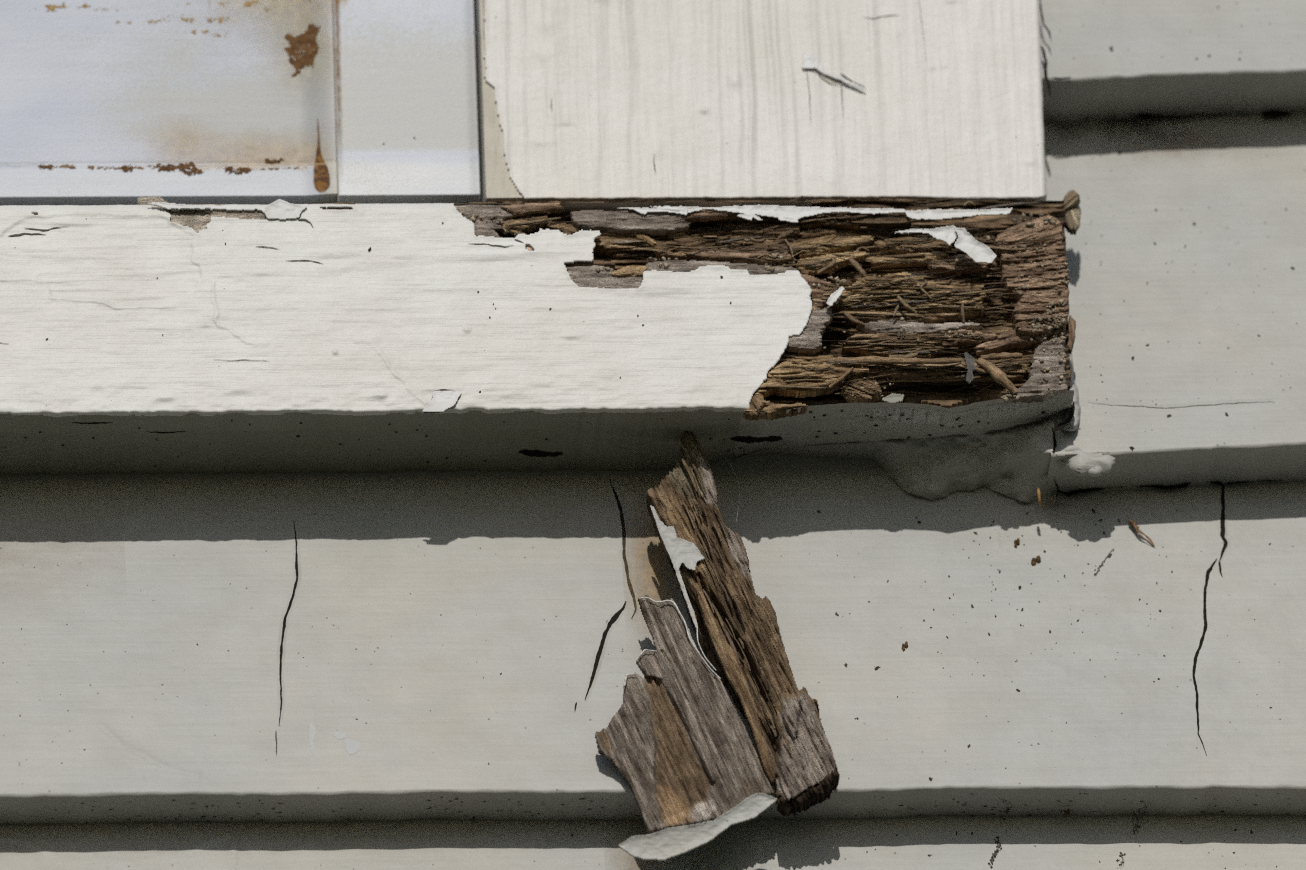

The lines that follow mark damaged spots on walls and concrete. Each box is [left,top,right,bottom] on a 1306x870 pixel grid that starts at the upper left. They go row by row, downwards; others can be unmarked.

corrosion [45,2,131,24]
corrosion [147,0,268,37]
corrosion [283,0,340,111]
corrosion [38,162,202,175]
corrosion [223,129,330,192]
peeling [617,204,1013,264]
peeling [826,286,845,306]
peeling [882,393,904,403]
crack [275,521,302,756]
crack [575,477,639,710]
crack [1192,485,1231,756]